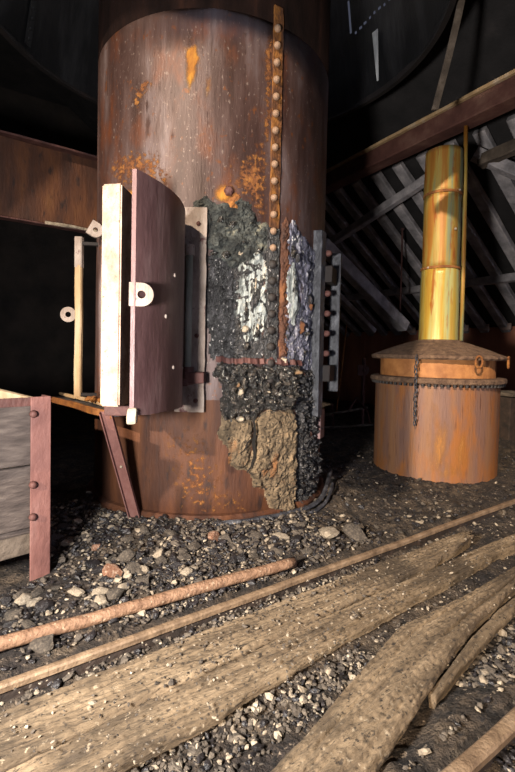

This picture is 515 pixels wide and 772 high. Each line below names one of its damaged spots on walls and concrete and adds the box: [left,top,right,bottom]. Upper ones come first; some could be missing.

corrosion [186,41,199,85]
corrosion [112,151,168,194]
corrosion [216,39,273,217]
peeling [193,193,269,351]
peeling [279,220,315,375]
corrosion [167,437,244,512]
peeling [217,404,298,511]